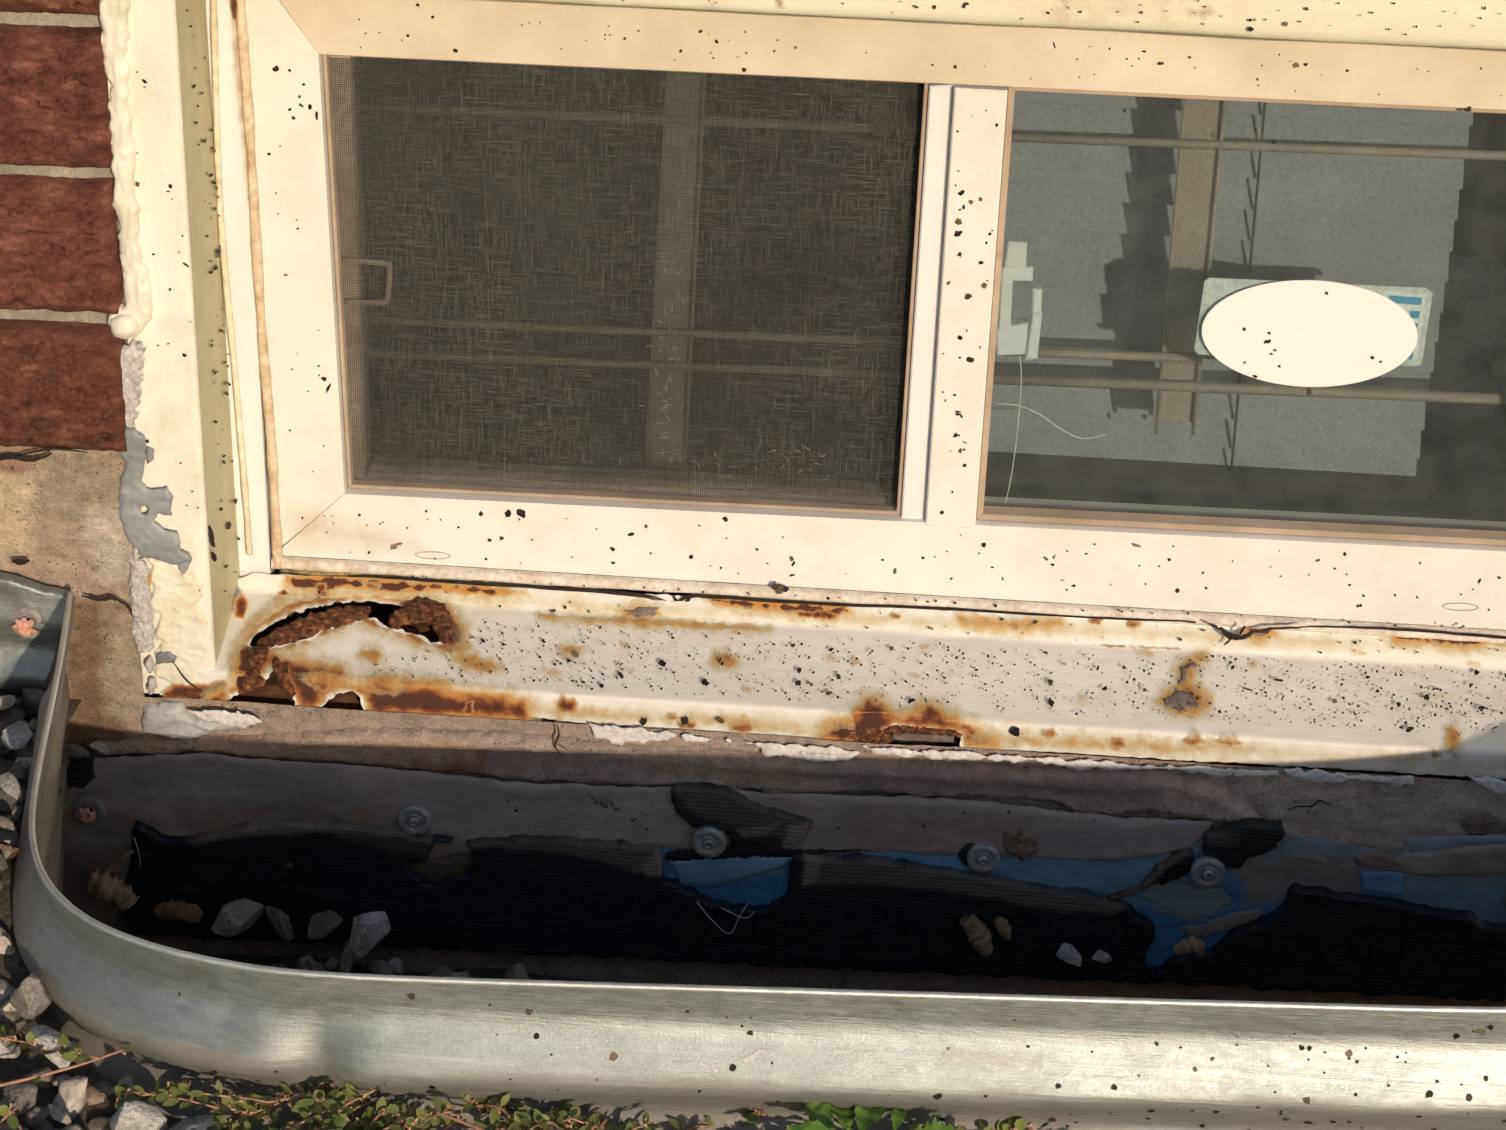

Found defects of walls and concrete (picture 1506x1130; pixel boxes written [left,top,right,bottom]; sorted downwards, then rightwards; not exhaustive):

rust [538,598,853,645]
rust [957,614,1065,632]
rust [162,572,537,721]
rust [712,652,740,669]
rust [1390,637,1506,665]
rust [556,696,619,718]
rust [816,645,1241,753]
rust [668,713,759,734]
rust [1432,726,1460,757]
spalling [1000,827,1039,861]